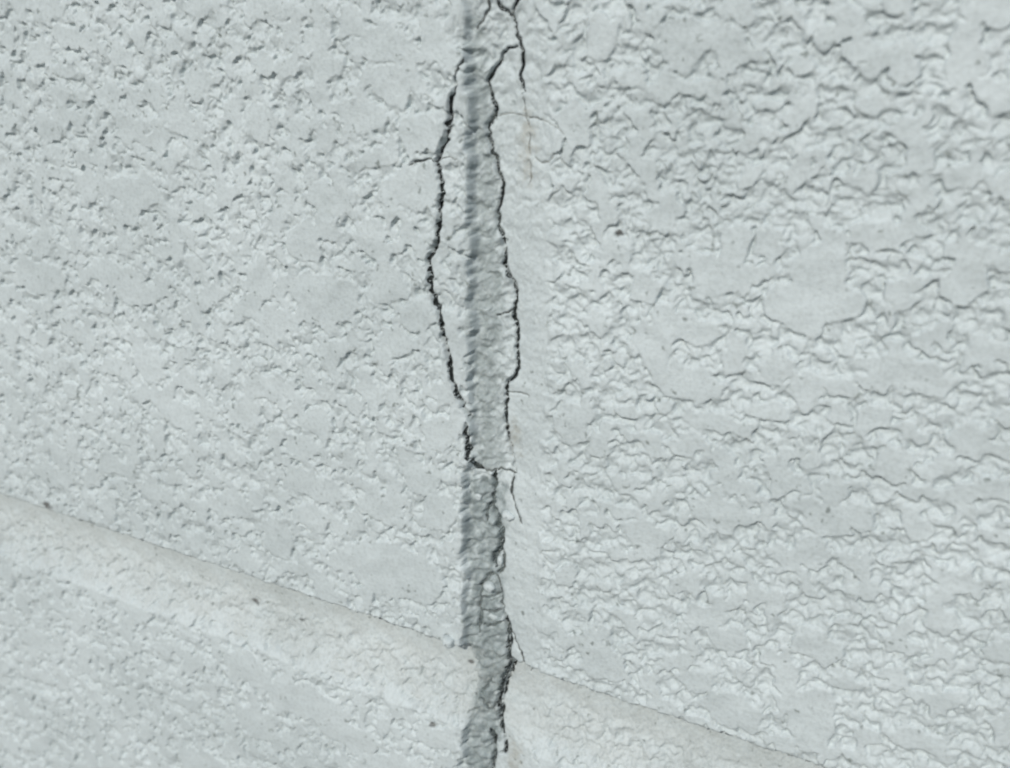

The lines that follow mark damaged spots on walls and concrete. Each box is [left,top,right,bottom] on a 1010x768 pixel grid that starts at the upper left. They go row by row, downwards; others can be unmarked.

crack [408,0,564,768]